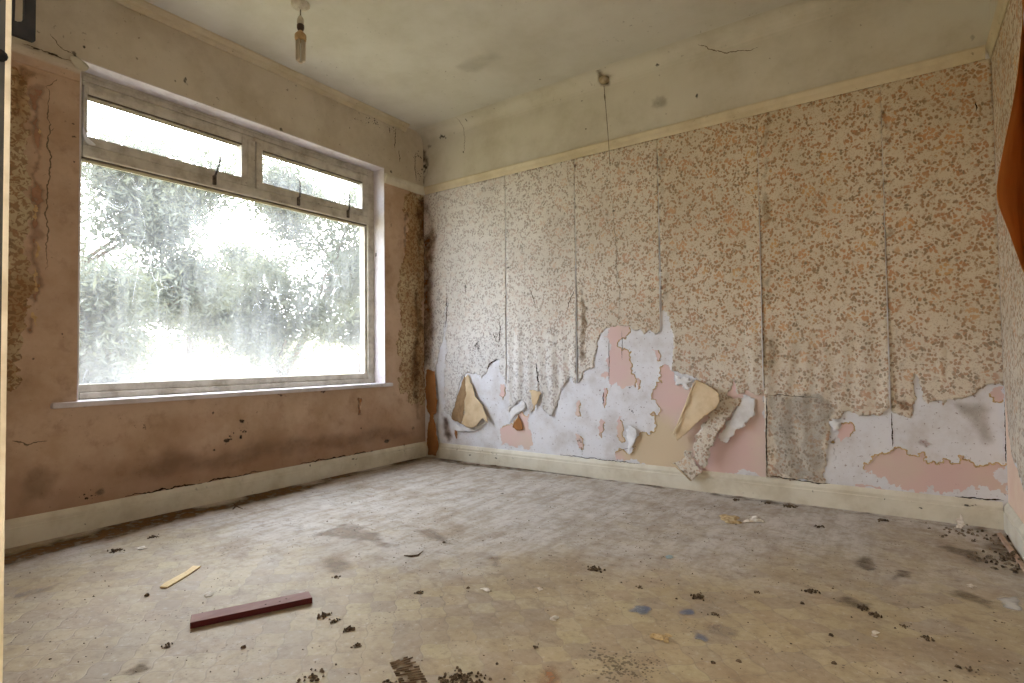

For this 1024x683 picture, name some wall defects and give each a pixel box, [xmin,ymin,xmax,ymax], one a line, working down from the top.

crack [698,44,758,54]
crack [22,34,71,269]
damp [404,199,435,398]
peeling [500,411,533,450]
peeling [598,325,766,477]
peeling [855,386,1024,523]